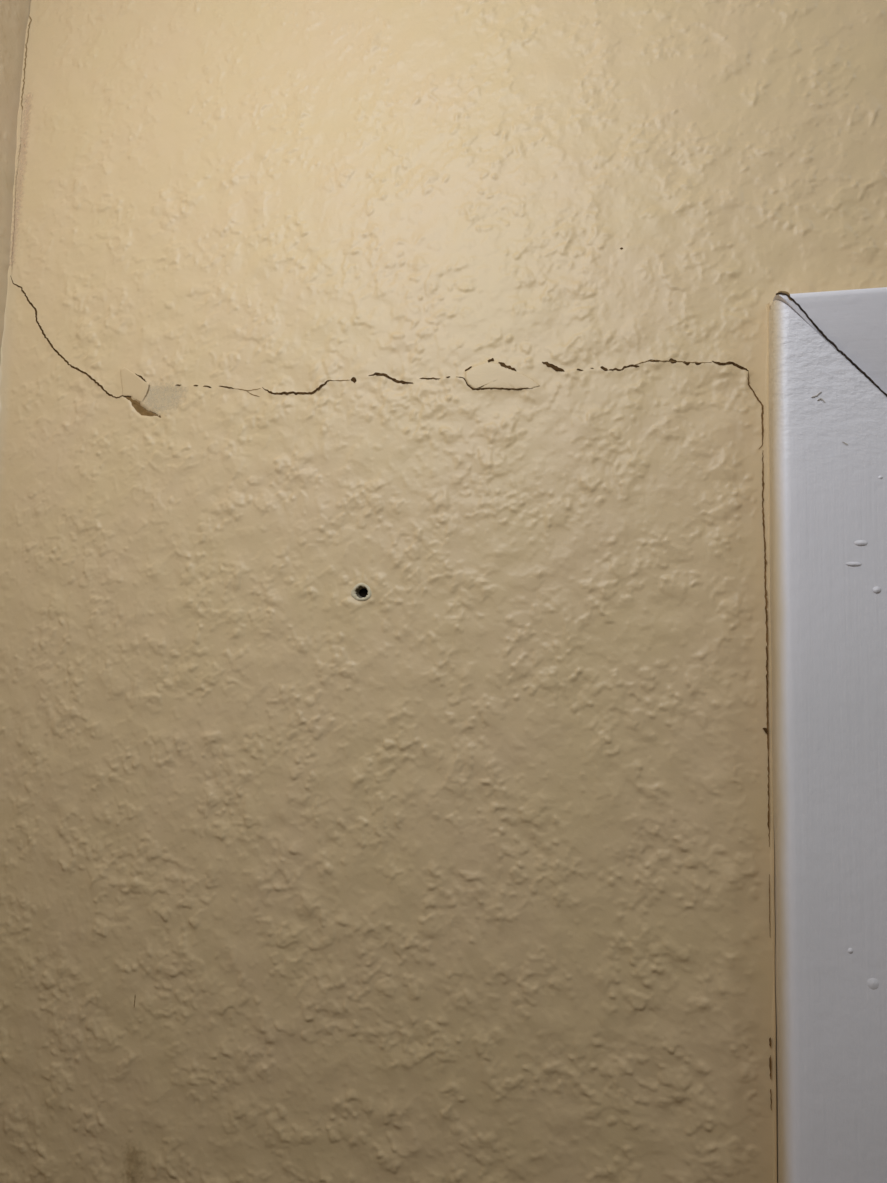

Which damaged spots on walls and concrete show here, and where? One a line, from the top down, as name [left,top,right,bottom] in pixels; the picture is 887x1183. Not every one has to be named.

crack [10,2,146,398]
peeling [120,367,161,418]
crack [176,358,770,922]
crack [766,1037,774,1110]